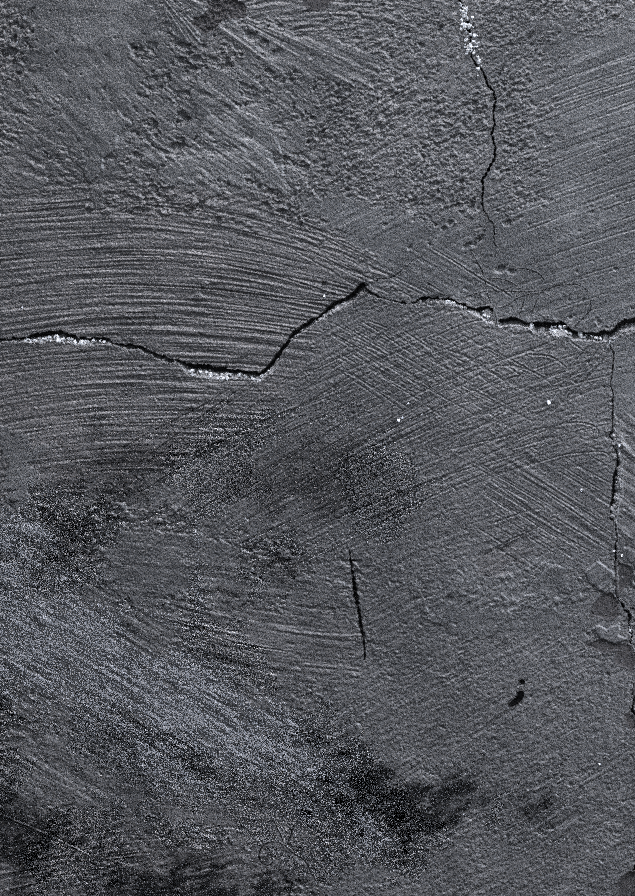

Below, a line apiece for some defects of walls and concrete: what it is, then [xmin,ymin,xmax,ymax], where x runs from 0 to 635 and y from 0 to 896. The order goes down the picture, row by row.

crack [456,0,498,249]
crack [0,251,635,727]
crack [257,822,318,883]